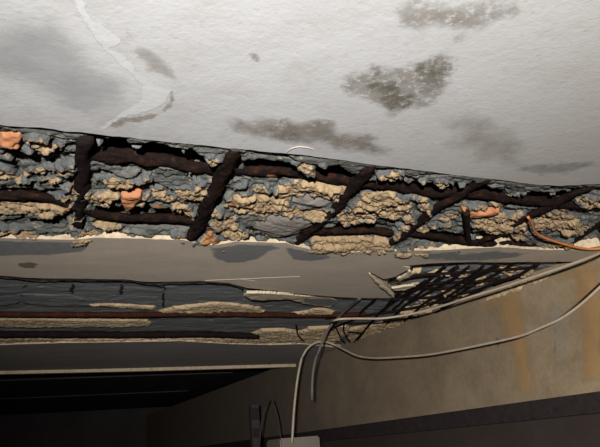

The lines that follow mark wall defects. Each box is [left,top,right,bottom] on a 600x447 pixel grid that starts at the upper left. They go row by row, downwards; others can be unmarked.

water stain [406,11,485,25]
water stain [74,0,173,130]
water stain [348,57,447,110]
water stain [237,122,376,152]
rust [204,230,218,245]
spalling [0,125,600,347]
water stain [213,245,276,262]
water stain [288,248,329,261]